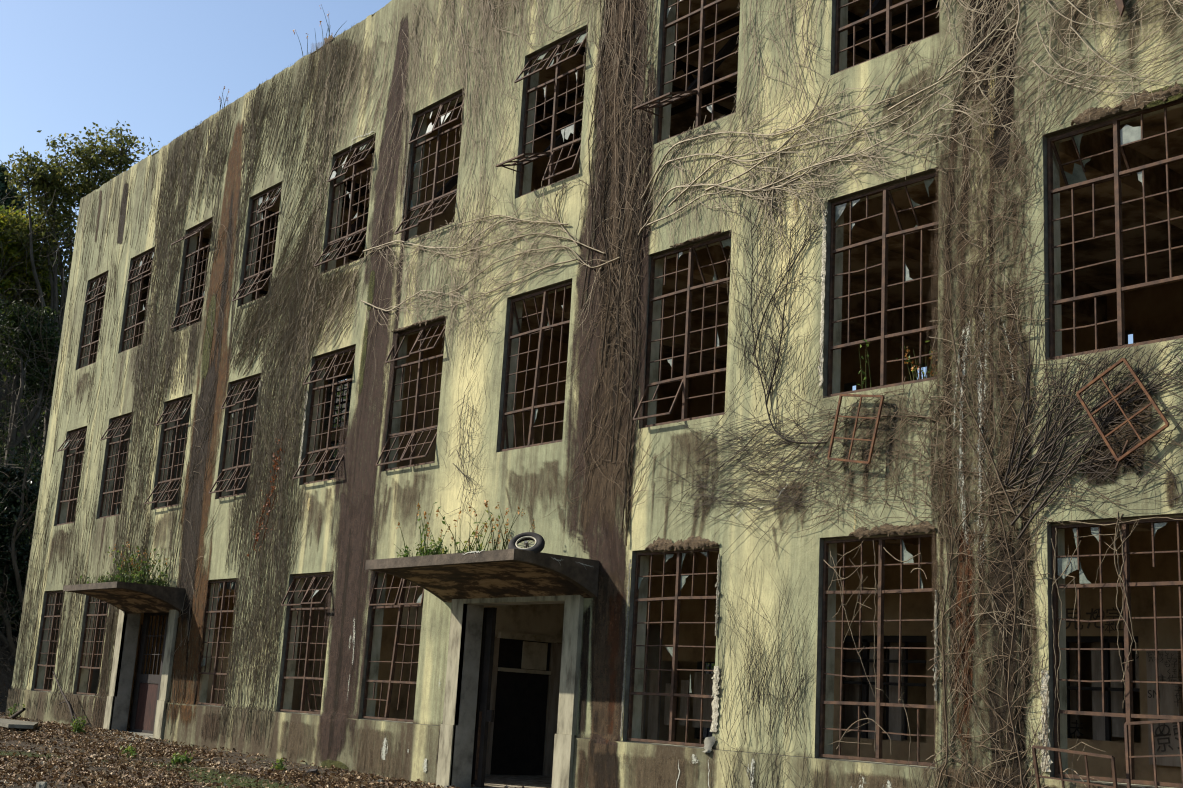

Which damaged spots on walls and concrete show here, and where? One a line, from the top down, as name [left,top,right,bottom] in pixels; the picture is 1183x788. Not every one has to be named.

leakage [1058,0,1177,66]
leakage [144,120,243,742]
leakage [279,18,425,779]
leakage [506,0,698,788]
leakage [651,431,719,539]
leakage [813,770,914,788]
leakage [843,399,914,502]
leakage [882,0,1056,788]